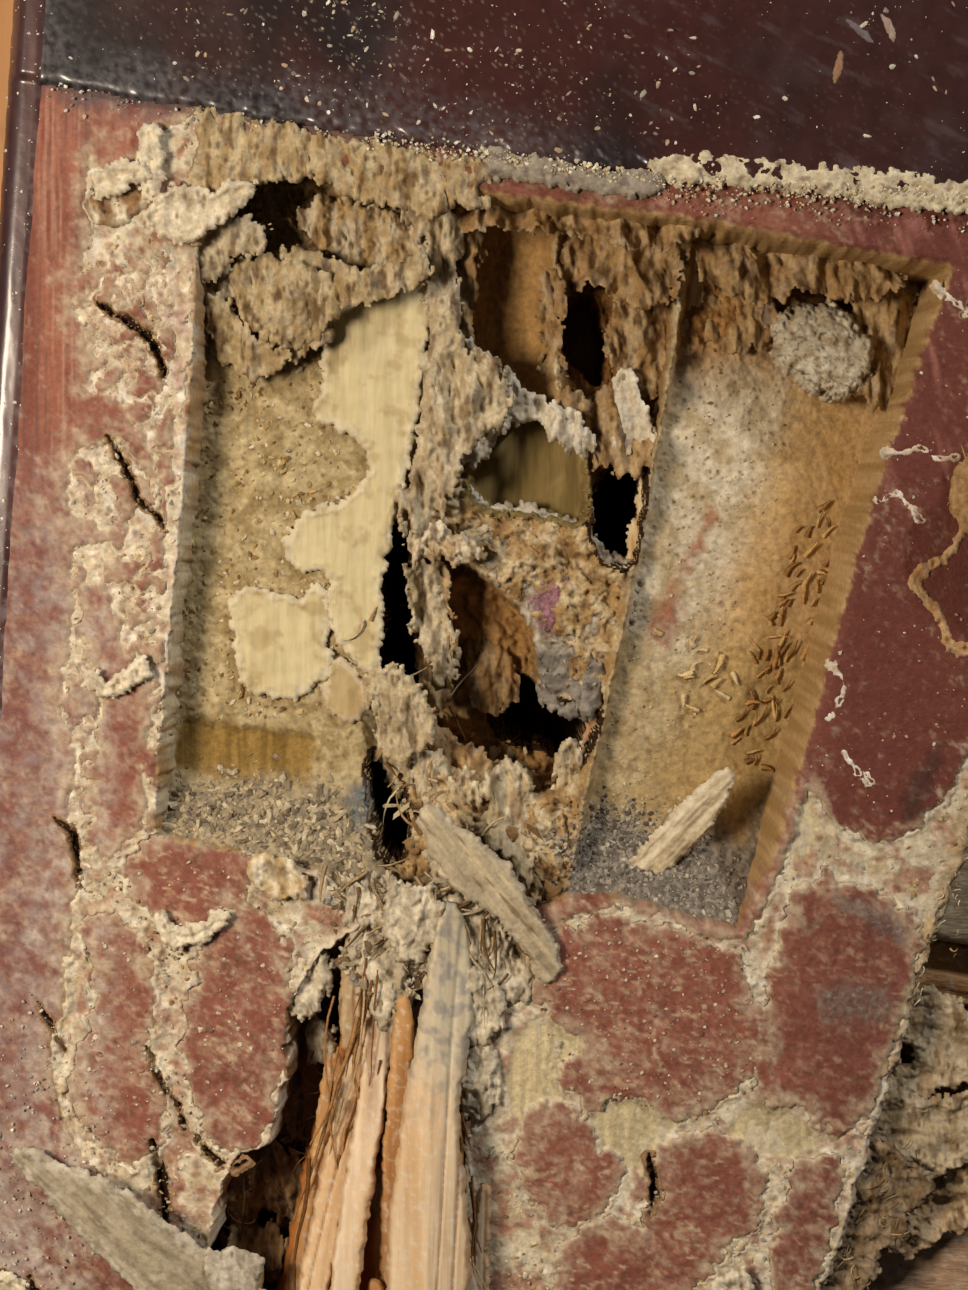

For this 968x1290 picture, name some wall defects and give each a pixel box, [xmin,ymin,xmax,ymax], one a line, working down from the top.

crack [93,296,170,382]
crack [103,432,167,537]
peeling [949,456,968,534]
spalling [148,105,920,996]
peeling [50,107,306,1290]
crack [35,1000,67,1053]
spalling [316,967,341,1043]
spalling [406,947,431,1046]
peeling [461,756,968,1290]
spalling [376,1108,387,1158]
crack [640,1150,664,1219]